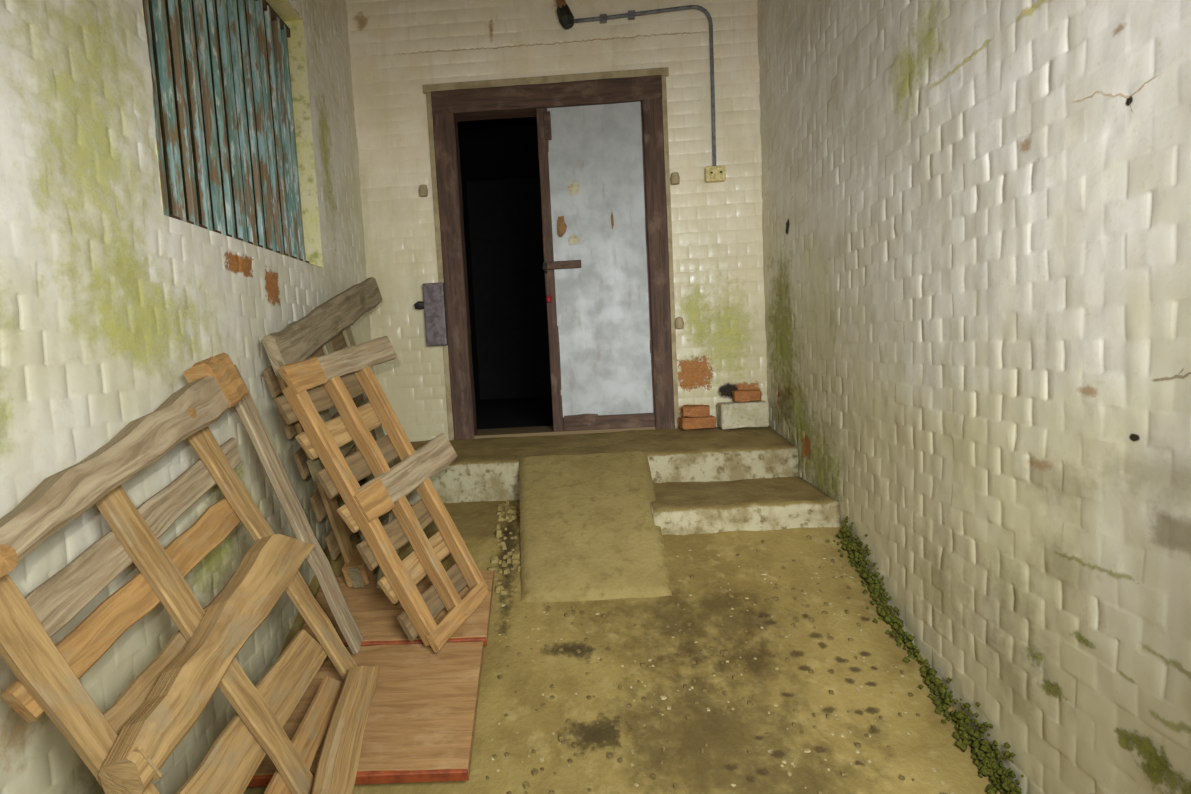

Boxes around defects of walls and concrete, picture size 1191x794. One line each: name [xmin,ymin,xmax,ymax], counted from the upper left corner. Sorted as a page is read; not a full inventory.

peeling [224,252,281,306]
spalling [677,355,713,417]
spalling [733,381,763,395]